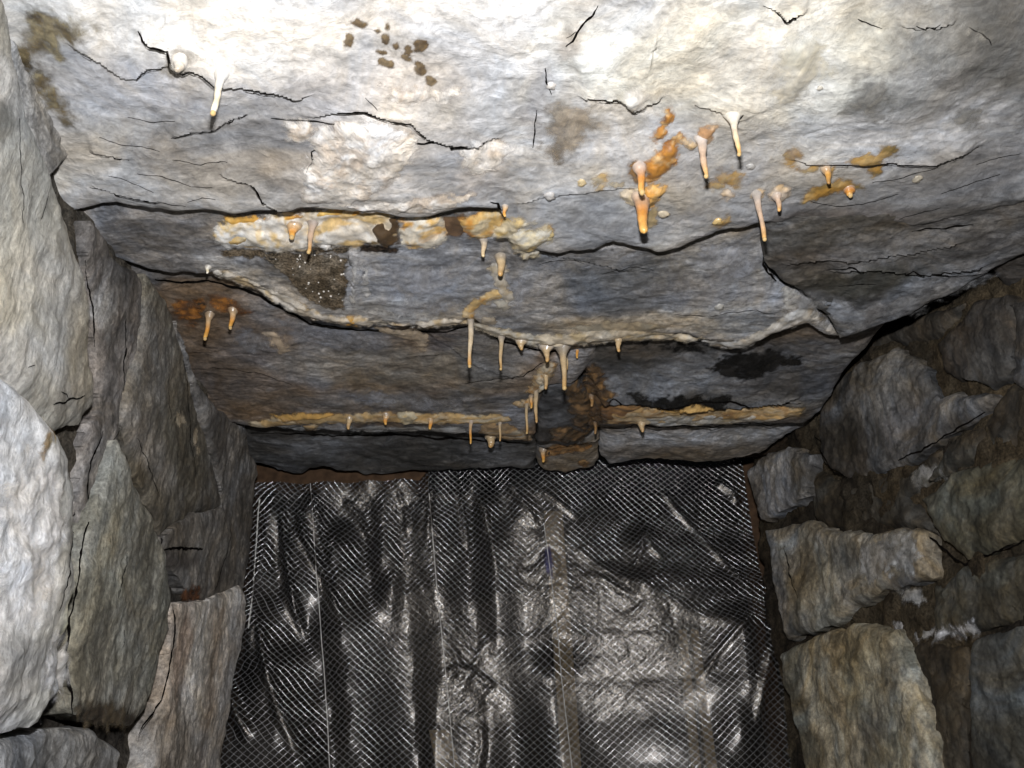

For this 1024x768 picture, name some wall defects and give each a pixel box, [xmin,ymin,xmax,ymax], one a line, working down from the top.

crack [136,31,214,88]
leakage [344,18,437,86]
crack [250,185,319,213]
crack [89,90,485,207]
leakage [620,109,718,228]
crack [809,147,1021,232]
leakage [212,209,991,380]
crack [761,233,777,281]
crack [828,267,985,287]
leakage [249,362,557,441]
leakage [600,392,805,427]